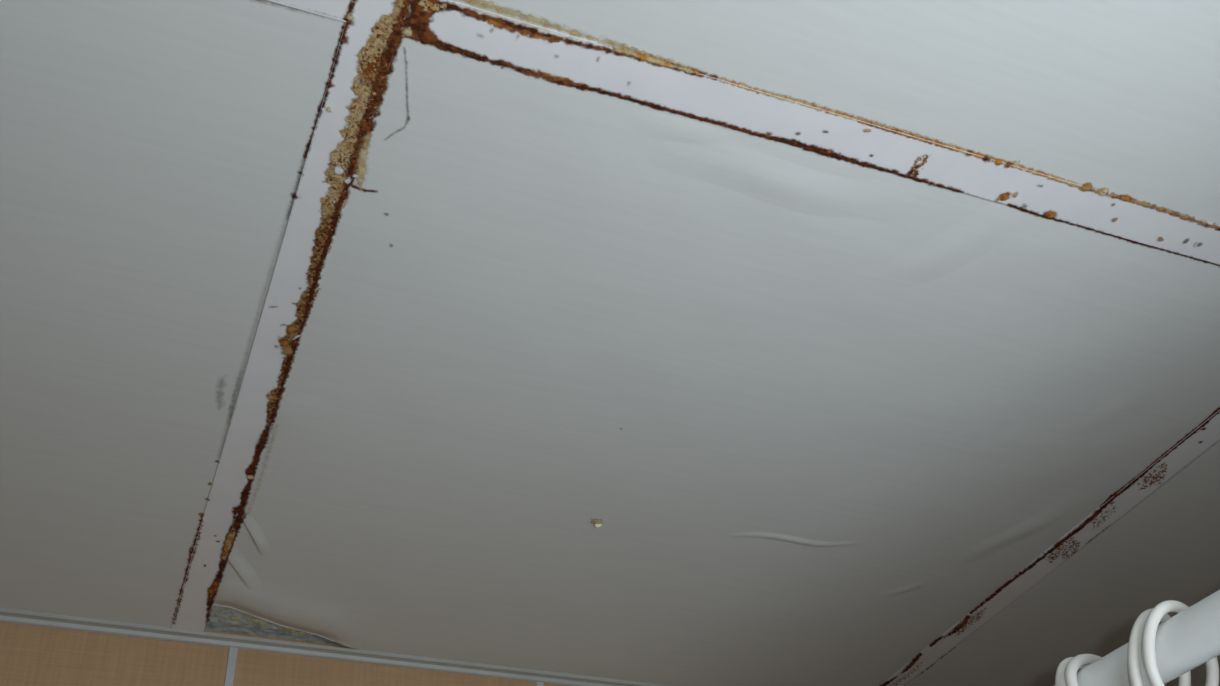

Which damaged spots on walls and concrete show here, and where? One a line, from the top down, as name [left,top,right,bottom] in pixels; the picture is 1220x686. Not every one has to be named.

corrosion [172,0,1220,624]
peeling [204,605,341,645]
corrosion [880,407,1220,686]